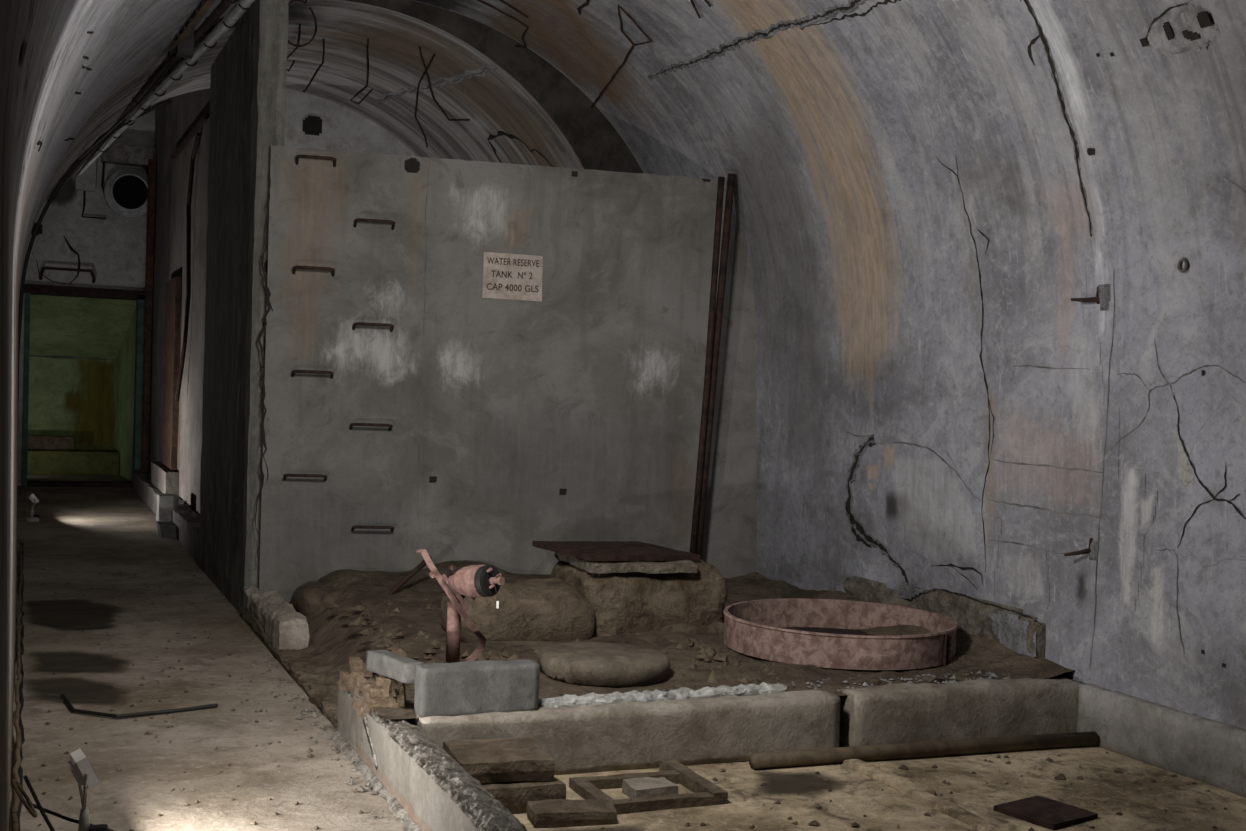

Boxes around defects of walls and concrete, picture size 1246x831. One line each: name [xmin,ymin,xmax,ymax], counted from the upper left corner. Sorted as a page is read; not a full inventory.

crack [648,0,901,81]
crack [1023,0,1093,237]
spalling [1139,0,1221,57]
crack [255,173,273,560]
crack [844,157,1246,662]